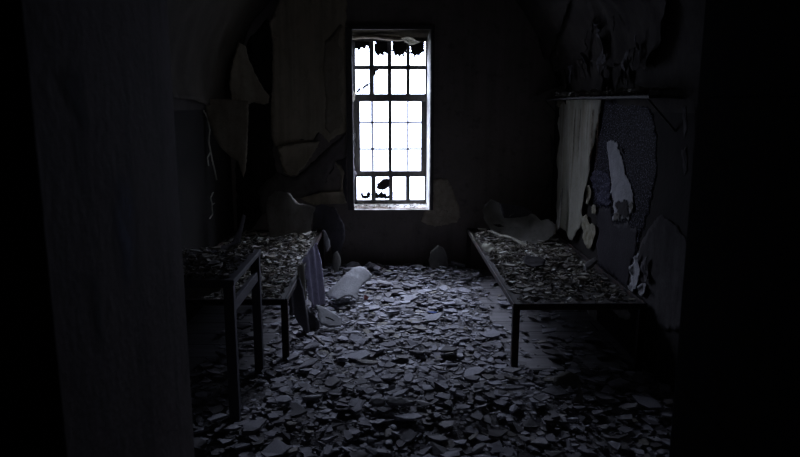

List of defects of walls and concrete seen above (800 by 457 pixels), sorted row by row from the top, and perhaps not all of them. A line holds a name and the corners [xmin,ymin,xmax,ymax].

peeling [269,0,429,176]
peeling [556,96,634,249]